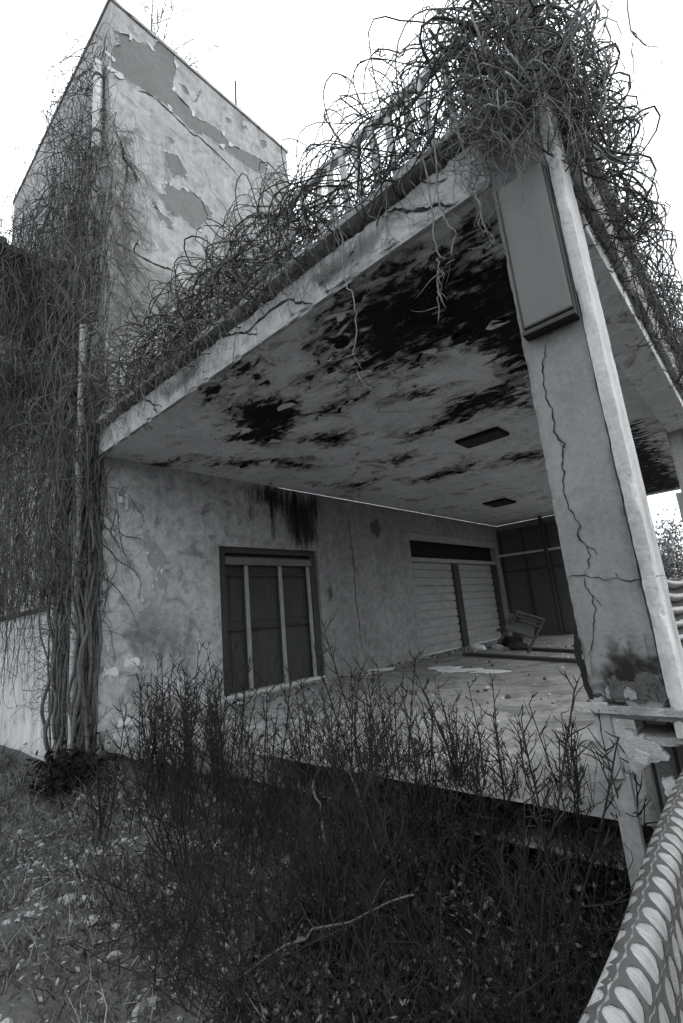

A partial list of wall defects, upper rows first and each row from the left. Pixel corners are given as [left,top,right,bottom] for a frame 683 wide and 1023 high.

flaking render [105,30,270,174]
flaking render [150,135,215,233]
leakage [197,206,531,469]
leakage [250,484,317,546]
leakage [412,462,475,483]
leakage [499,451,545,465]
crack [542,333,657,663]
leakage [629,415,680,495]